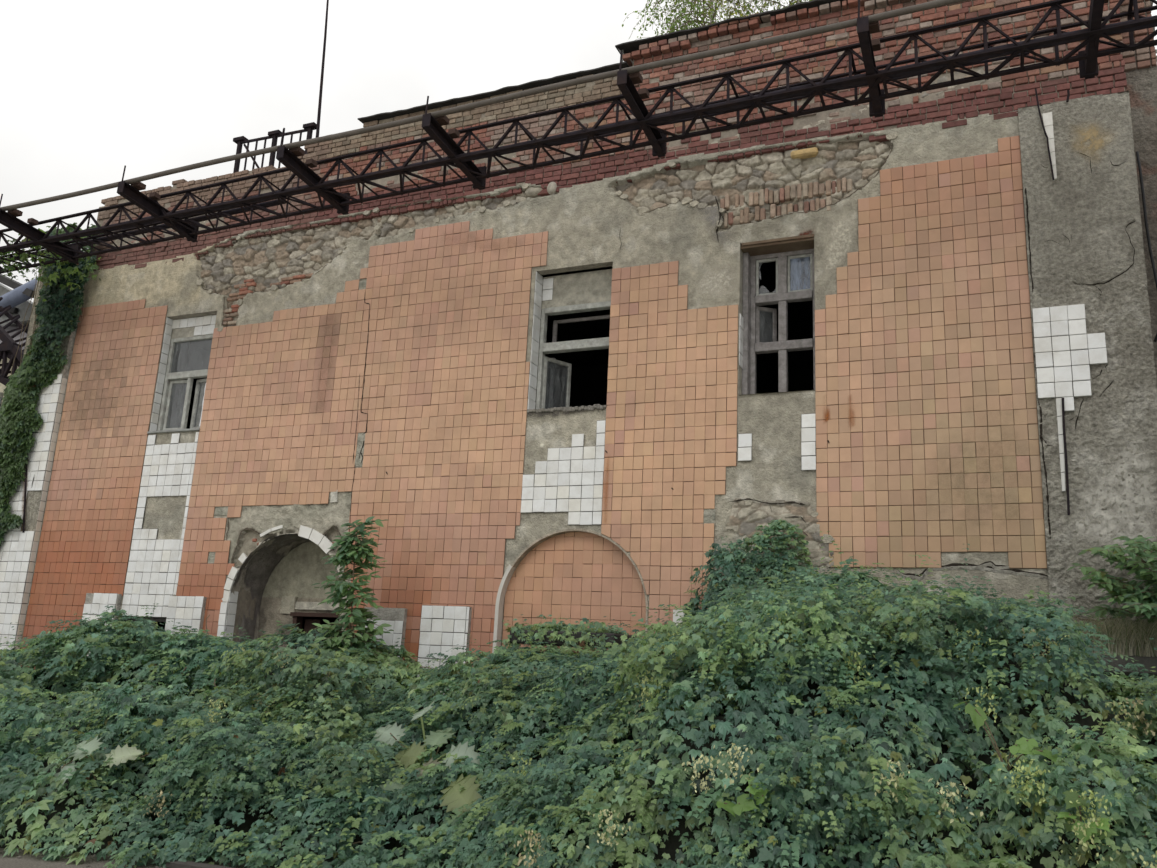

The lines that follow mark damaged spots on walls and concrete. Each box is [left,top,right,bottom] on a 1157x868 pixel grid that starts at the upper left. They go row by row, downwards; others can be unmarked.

spalling [916,66,1002,99]
spalling [610,94,898,231]
spalling [196,182,559,332]
crack [349,297,370,532]
spalling [208,492,352,568]